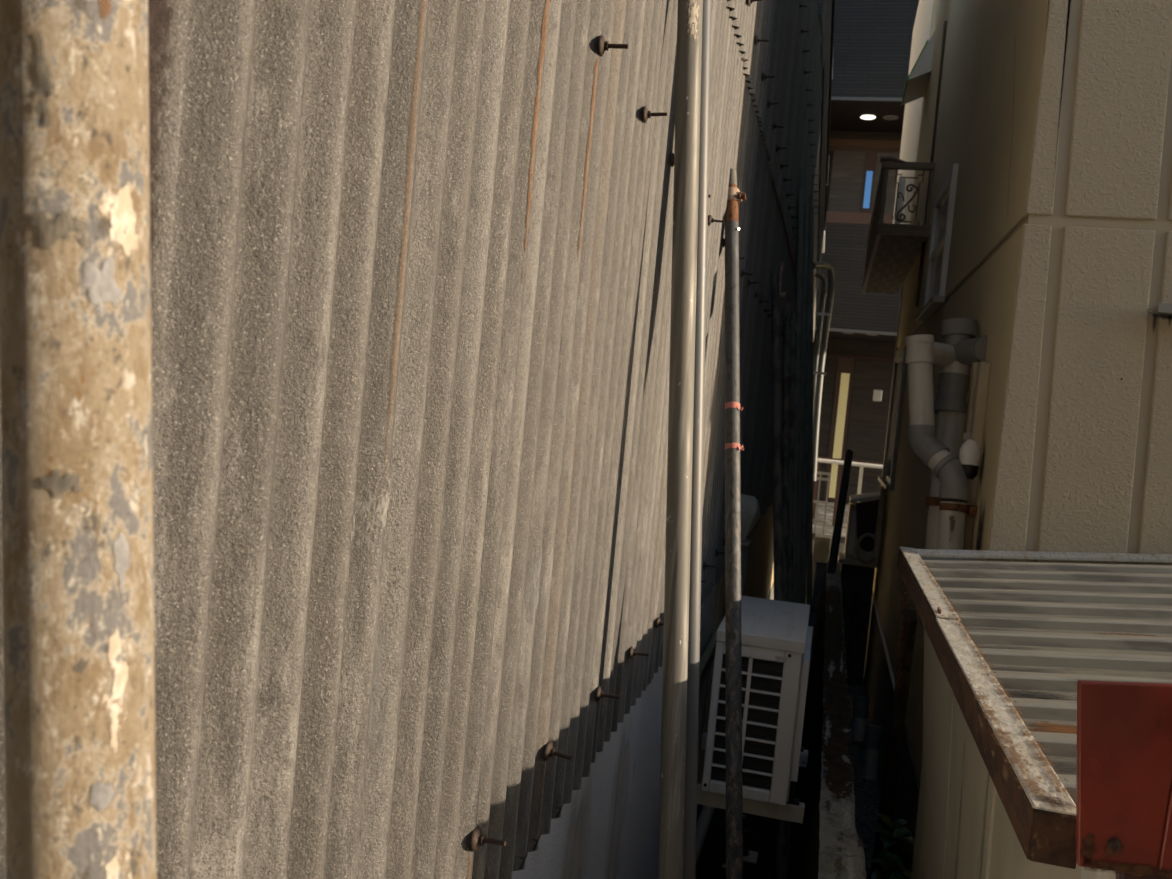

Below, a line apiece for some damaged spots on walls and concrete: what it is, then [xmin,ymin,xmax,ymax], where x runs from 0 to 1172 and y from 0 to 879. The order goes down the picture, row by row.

peeling [34,31,54,127]
peeling [30,181,141,314]
rust [525,0,550,251]
rust [579,60,599,251]
rust [918,558,1077,807]
rust [1080,834,1172,879]